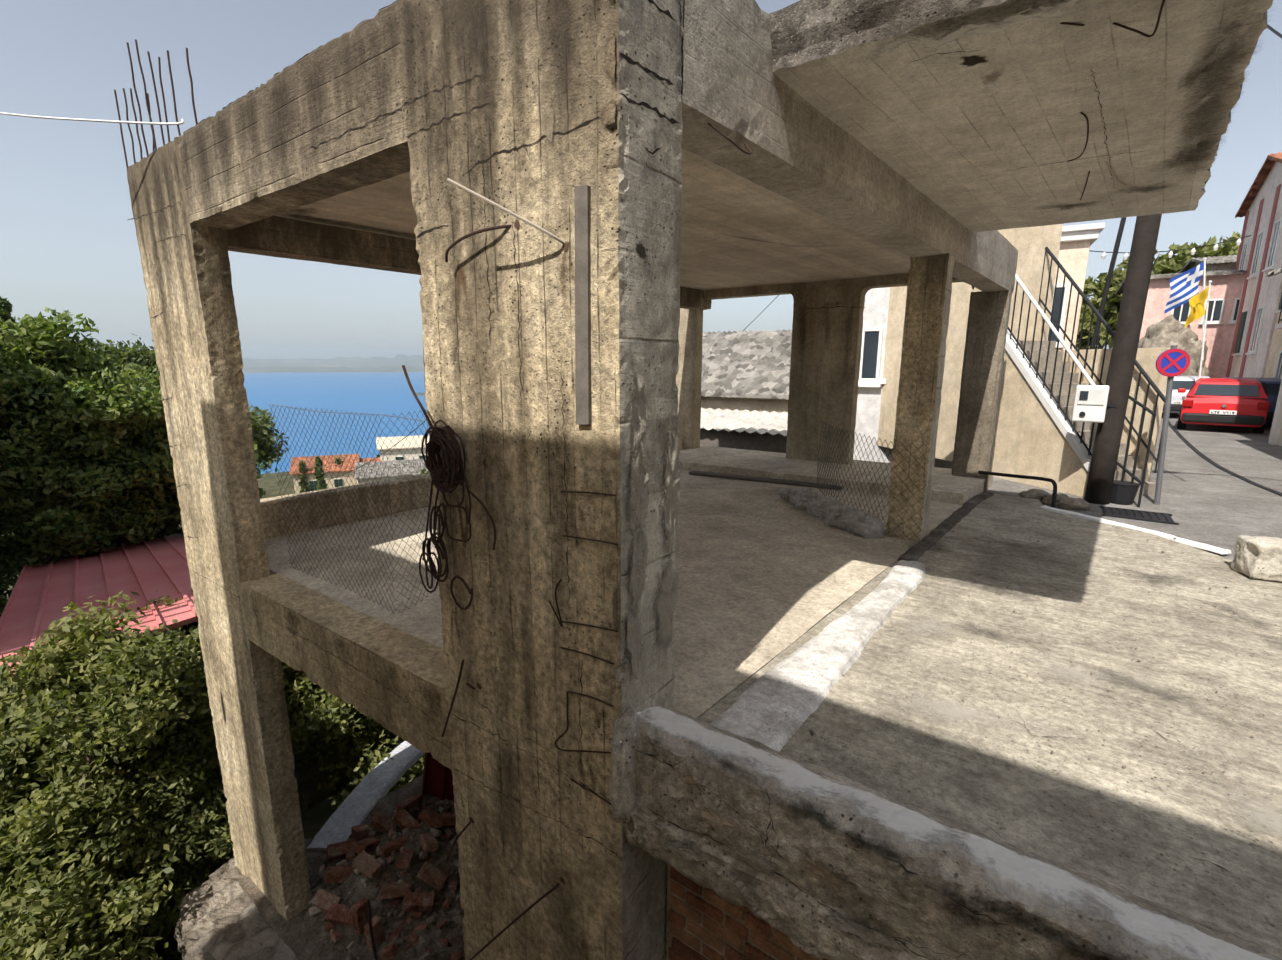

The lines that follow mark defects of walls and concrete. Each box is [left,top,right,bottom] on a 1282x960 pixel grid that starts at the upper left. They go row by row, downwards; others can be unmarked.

leakage [1169,1,1254,171]
crack [463,0,683,412]
leakage [940,885,1083,957]